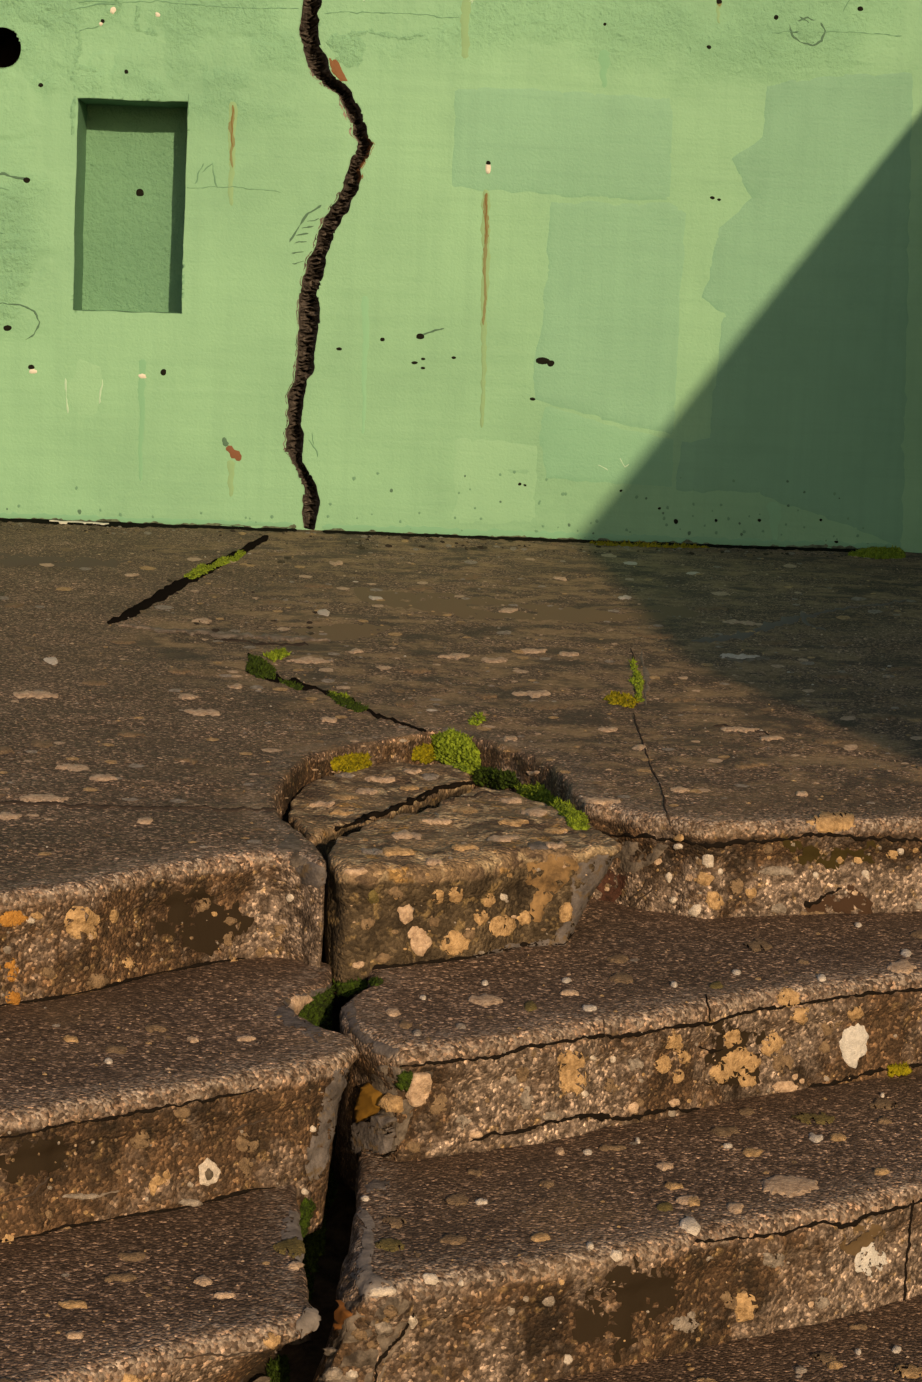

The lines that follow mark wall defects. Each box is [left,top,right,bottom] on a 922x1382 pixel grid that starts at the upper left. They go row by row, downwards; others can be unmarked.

crack [70,0,459,530]
rust [480,190,491,428]
crack [107,535,269,624]
crack [214,638,427,732]
crack [334,781,505,832]
crack [175,1351,264,1359]
crack [374,1313,417,1382]